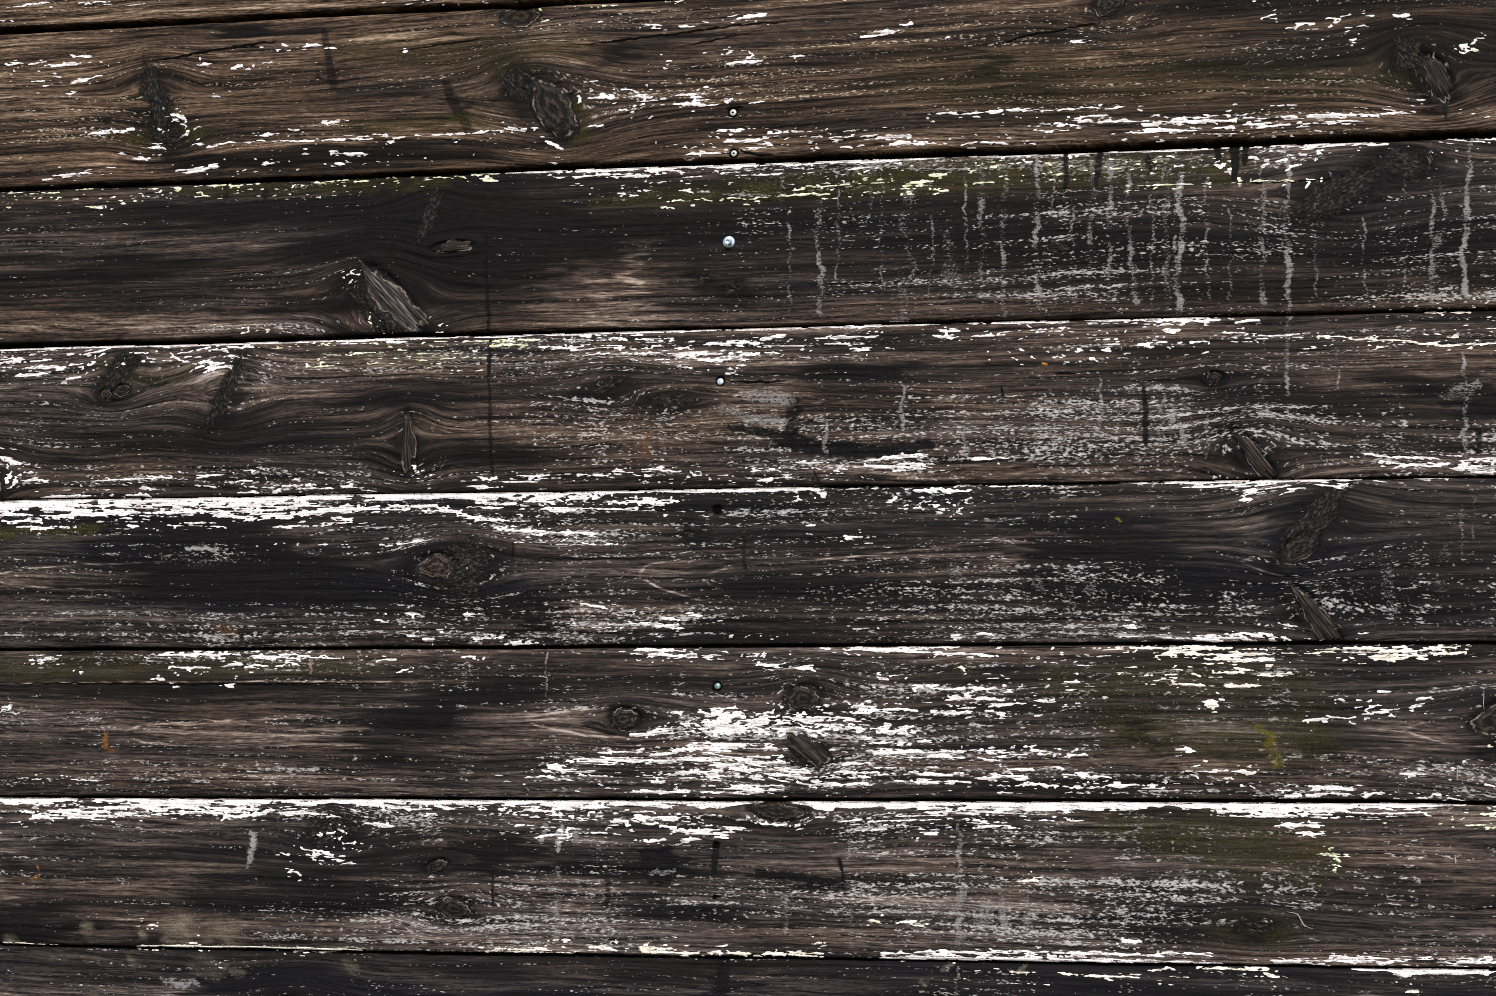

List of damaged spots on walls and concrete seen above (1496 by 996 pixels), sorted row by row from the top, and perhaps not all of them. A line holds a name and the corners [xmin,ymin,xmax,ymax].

peeling [5,54,120,99]
peeling [6,80,1425,215]
damp [1033,154,1068,243]
damp [1092,153,1132,208]
damp [1145,155,1187,310]
damp [1214,147,1265,222]
damp [1459,144,1473,299]
peeling [0,447,1063,551]
peeling [1120,446,1496,503]
peeling [0,600,1496,881]
peeling [478,936,826,958]
peeling [880,937,1496,993]